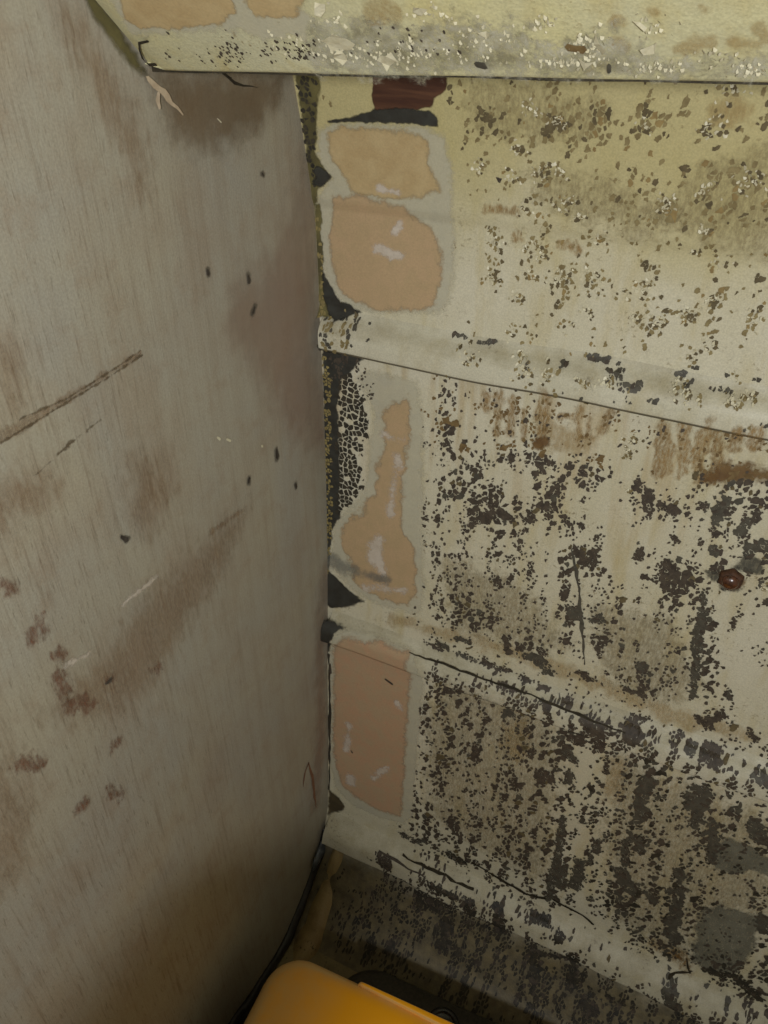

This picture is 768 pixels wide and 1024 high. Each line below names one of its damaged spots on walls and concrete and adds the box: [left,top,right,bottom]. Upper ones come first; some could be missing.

leakage [173,80,269,133]
peeling [196,1,768,1024]
rust [705,554,763,591]
leakage [50,646,95,713]
crack [409,652,626,734]
crack [379,850,594,925]